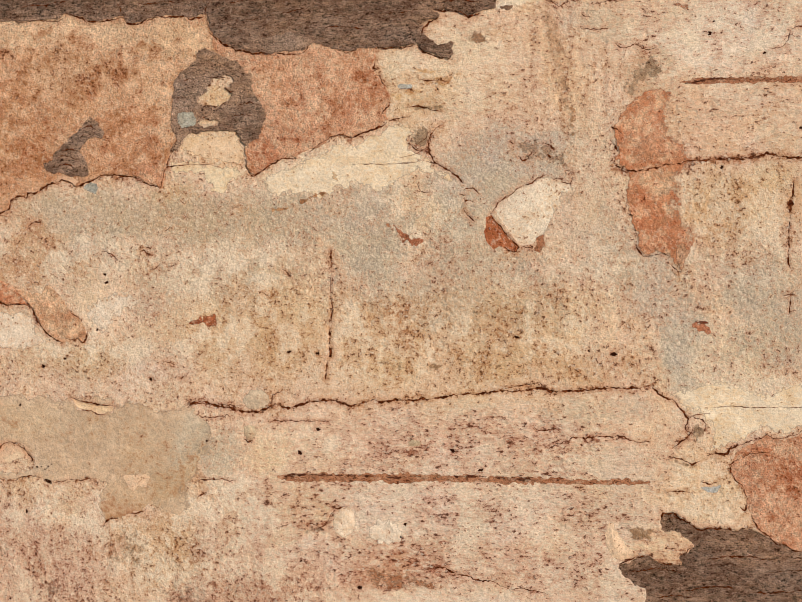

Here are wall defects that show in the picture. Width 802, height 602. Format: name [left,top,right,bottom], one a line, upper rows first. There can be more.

peeling [0,0,496,212]
peeling [484,177,572,251]
peeling [614,88,695,271]
crack [786,183,794,225]
peeling [0,281,136,351]
crack [325,251,337,379]
crack [0,442,95,483]
peeling [0,394,211,521]
crack [186,383,802,559]
spalling [619,382,802,602]
crack [620,548,691,565]